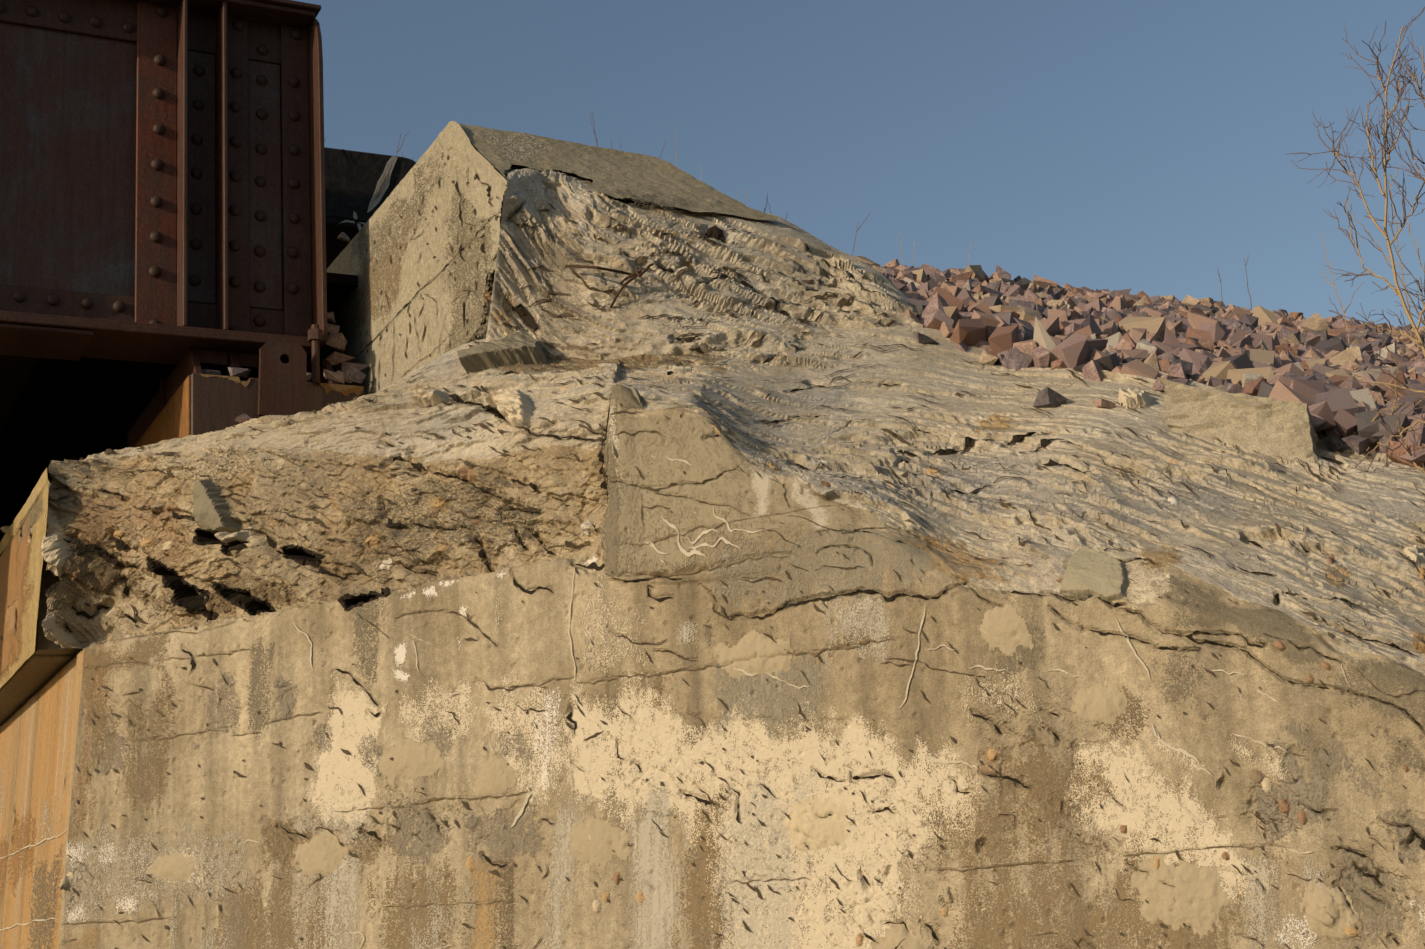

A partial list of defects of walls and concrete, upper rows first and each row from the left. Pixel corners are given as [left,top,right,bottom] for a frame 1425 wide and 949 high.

crack [355,171,496,382]
corrosion [200,374,251,387]
corrosion [313,383,364,396]
spalling [86,152,1425,676]
crack [355,410,1425,773]
water stain [333,465,589,949]
water stain [197,788,520,949]
crack [482,854,506,868]
crack [511,792,553,827]
water stain [624,762,823,949]
crack [682,784,775,823]
crack [813,765,895,816]